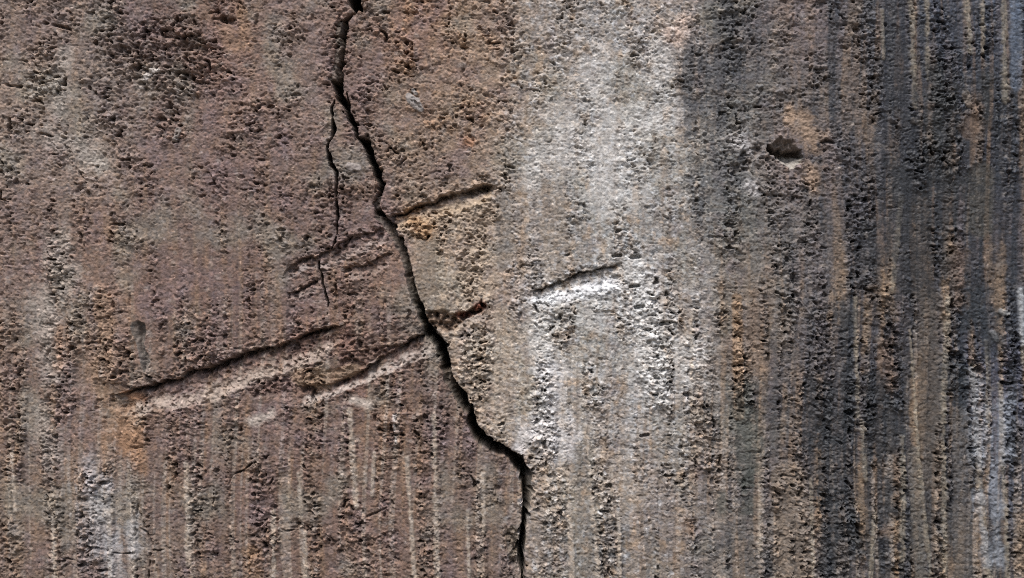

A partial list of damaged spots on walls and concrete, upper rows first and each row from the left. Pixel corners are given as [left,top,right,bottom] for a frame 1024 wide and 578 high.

crack [317,0,536,578]
water stain [783,0,1024,578]
crack [226,461,254,486]
crack [123,505,172,578]
crack [252,507,312,534]
water stain [758,548,784,578]